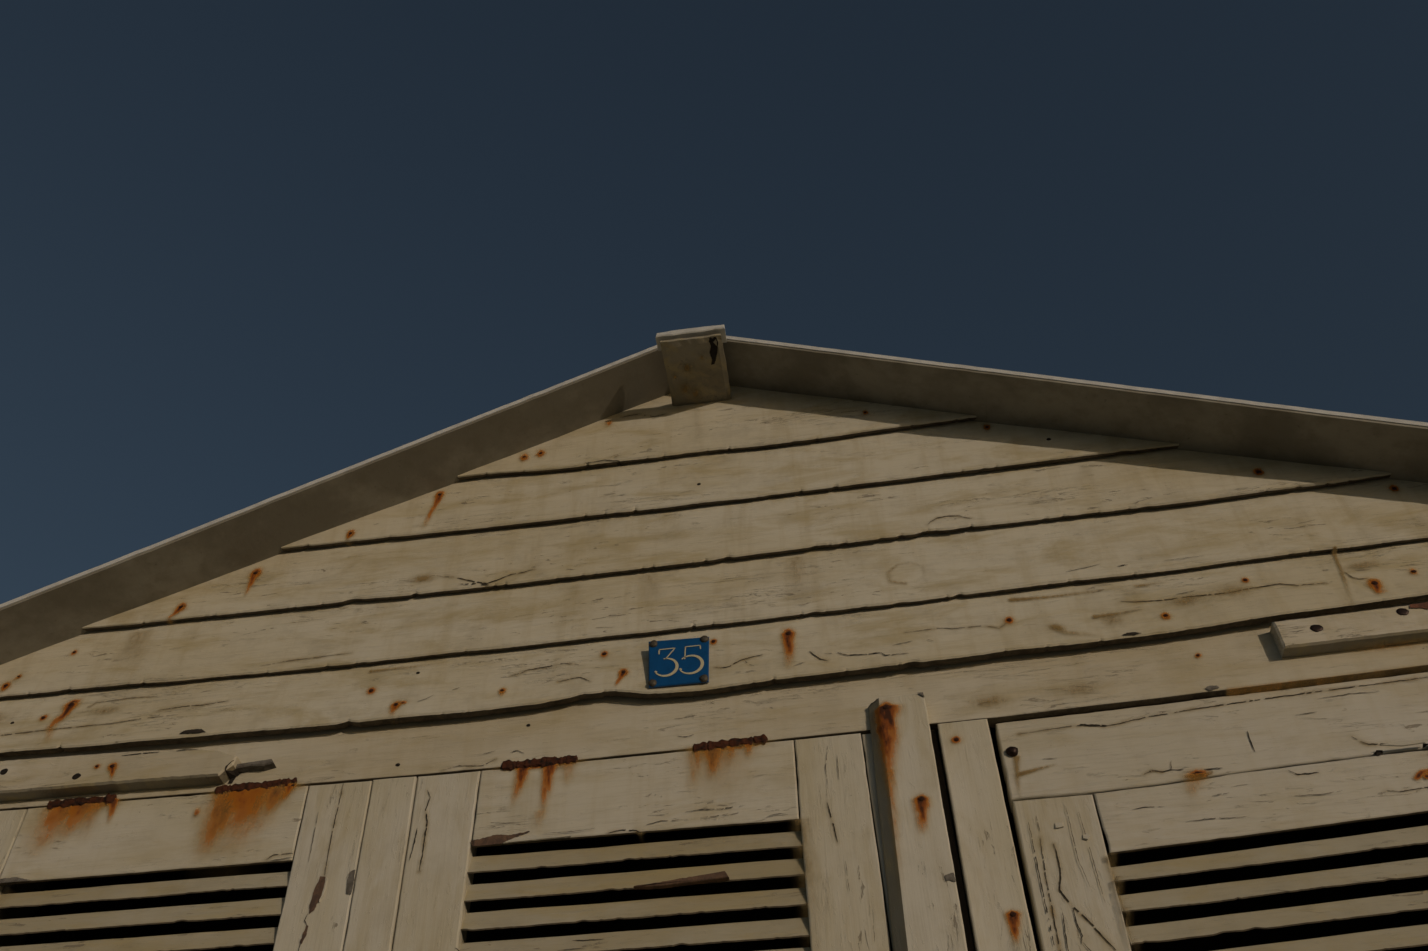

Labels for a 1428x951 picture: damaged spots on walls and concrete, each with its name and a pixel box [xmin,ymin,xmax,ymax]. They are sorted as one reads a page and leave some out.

corrosion [428,491,444,518]
corrosion [782,628,795,659]
corrosion [40,699,80,731]
corrosion [874,702,899,822]
peeling [1374,739,1428,756]
corrosion [1414,769,1428,780]
corrosion [44,798,118,839]
corrosion [194,784,296,845]
crack [266,786,343,870]
corrosion [914,794,930,828]
crack [1028,809,1116,951]
corrosion [1006,910,1020,940]